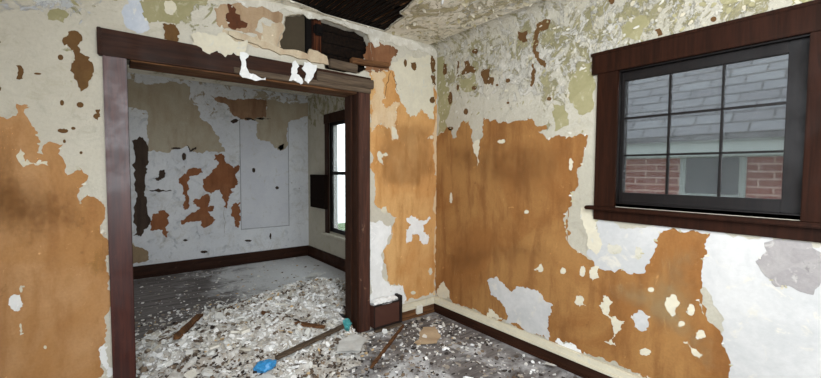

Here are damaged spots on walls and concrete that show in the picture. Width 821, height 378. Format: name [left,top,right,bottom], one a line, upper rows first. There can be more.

peeling [0,104,113,378]
flaking render [128,79,241,264]
peeling [191,0,821,378]